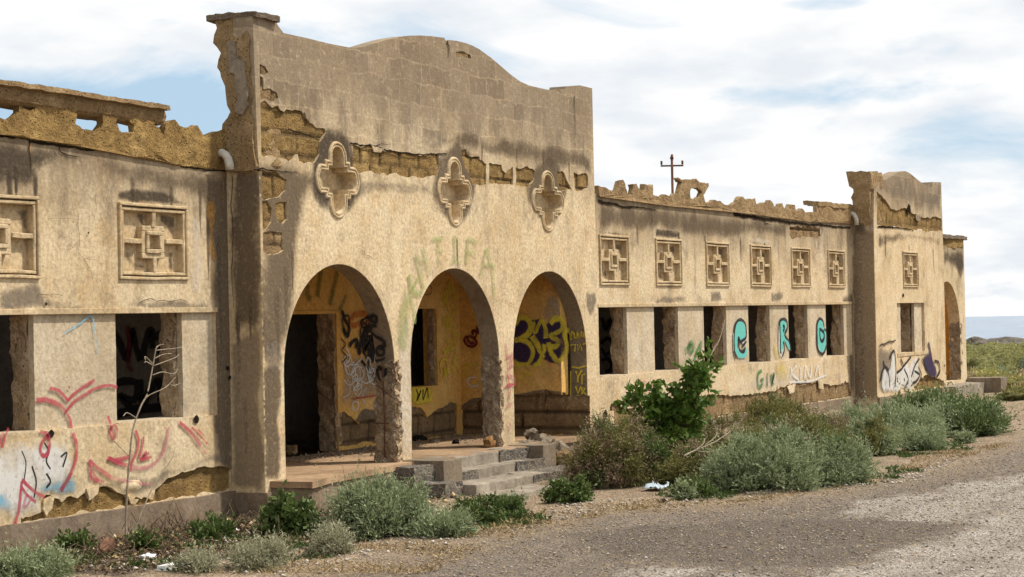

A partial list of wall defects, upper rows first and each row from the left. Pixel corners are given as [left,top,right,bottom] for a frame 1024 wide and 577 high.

spalling [260,65,324,163]
spalling [352,145,438,178]
spalling [462,149,533,187]
leakage [434,135,589,217]
spalling [557,171,587,191]
spalling [262,170,286,255]
spalling [877,194,941,233]
leakage [119,130,364,487]
spalling [335,356,591,463]
spalling [697,379,851,419]
spalling [21,466,229,522]